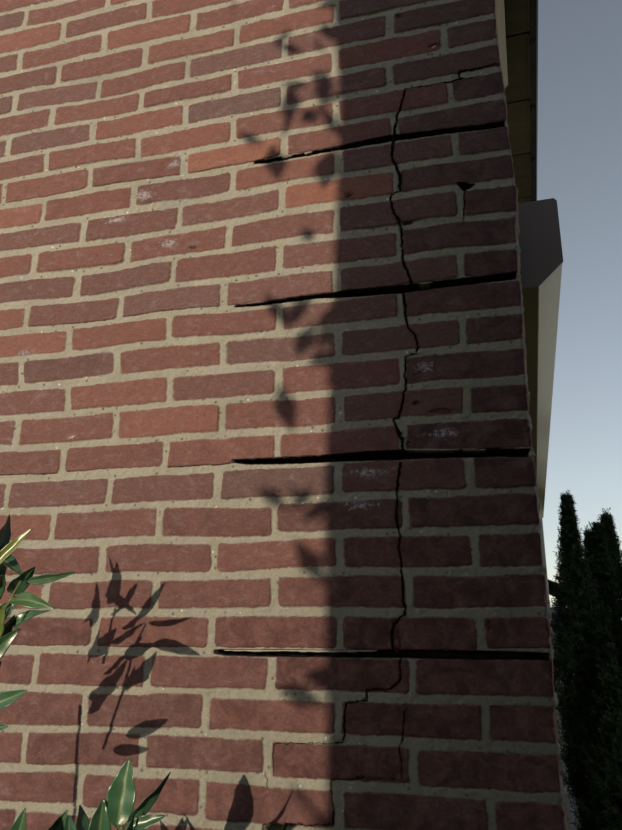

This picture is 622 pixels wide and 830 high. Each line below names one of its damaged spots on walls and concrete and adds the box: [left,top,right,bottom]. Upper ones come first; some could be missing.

crack [283,705,407,830]
crack [217,63,556,789]